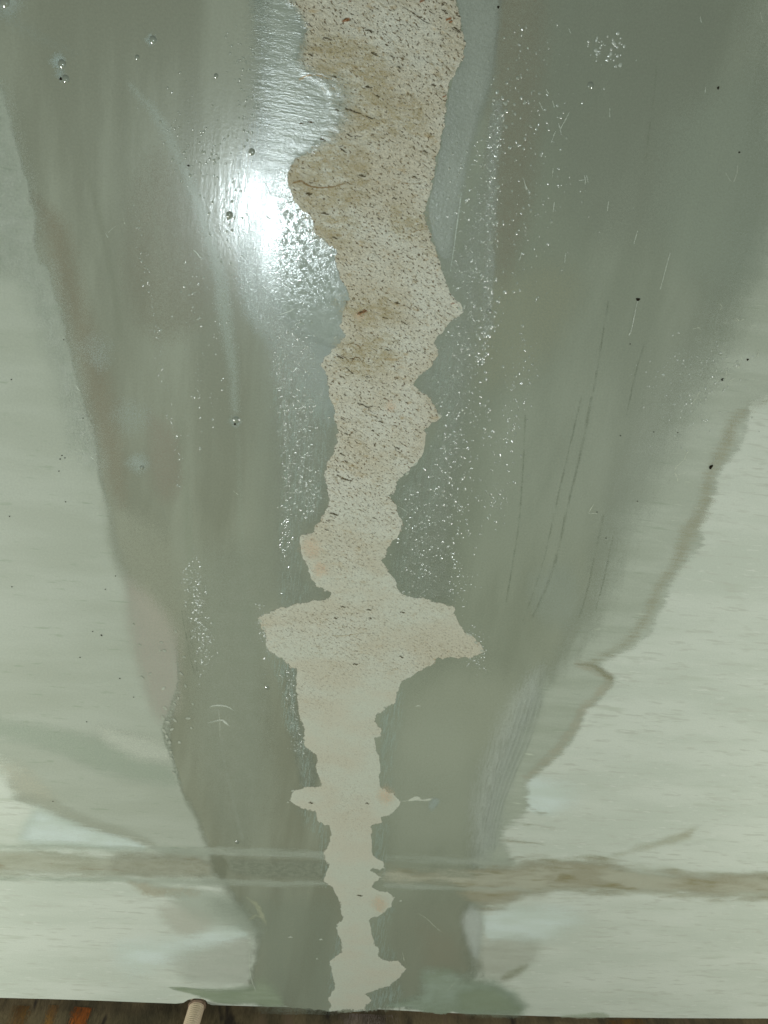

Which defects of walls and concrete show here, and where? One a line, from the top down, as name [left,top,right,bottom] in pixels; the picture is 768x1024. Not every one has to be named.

damp [0,0,360,1015]
peeling [258,0,485,1012]
damp [358,0,768,1019]